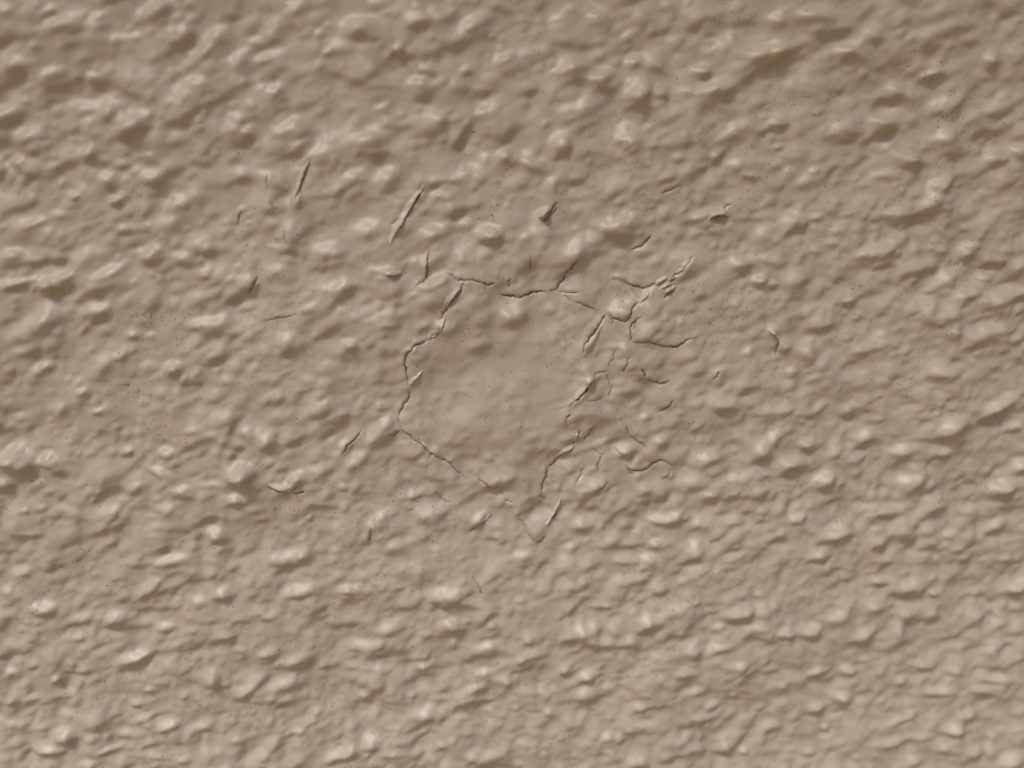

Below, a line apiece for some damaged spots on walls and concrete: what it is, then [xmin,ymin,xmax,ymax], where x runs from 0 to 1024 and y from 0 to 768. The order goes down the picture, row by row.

crack [391,250,696,543]